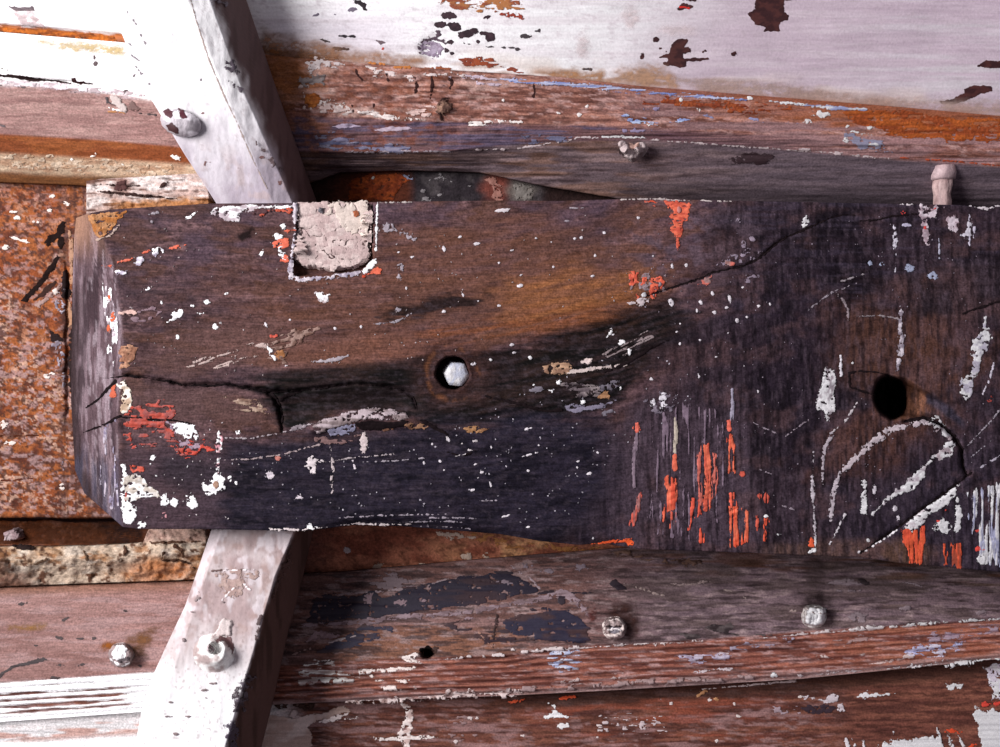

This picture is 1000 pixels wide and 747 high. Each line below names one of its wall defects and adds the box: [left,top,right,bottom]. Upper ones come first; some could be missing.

peeling [434,12,541,55]
corrosion [642,96,793,115]
corrosion [843,107,1000,143]
corrosion [348,172,414,202]
peeling [211,173,452,303]
crack [647,213,917,296]
crack [603,340,668,373]
peeling [100,381,237,528]
crack [83,374,476,456]
crack [485,395,563,412]
peeling [629,388,779,548]
peeling [262,563,1000,747]